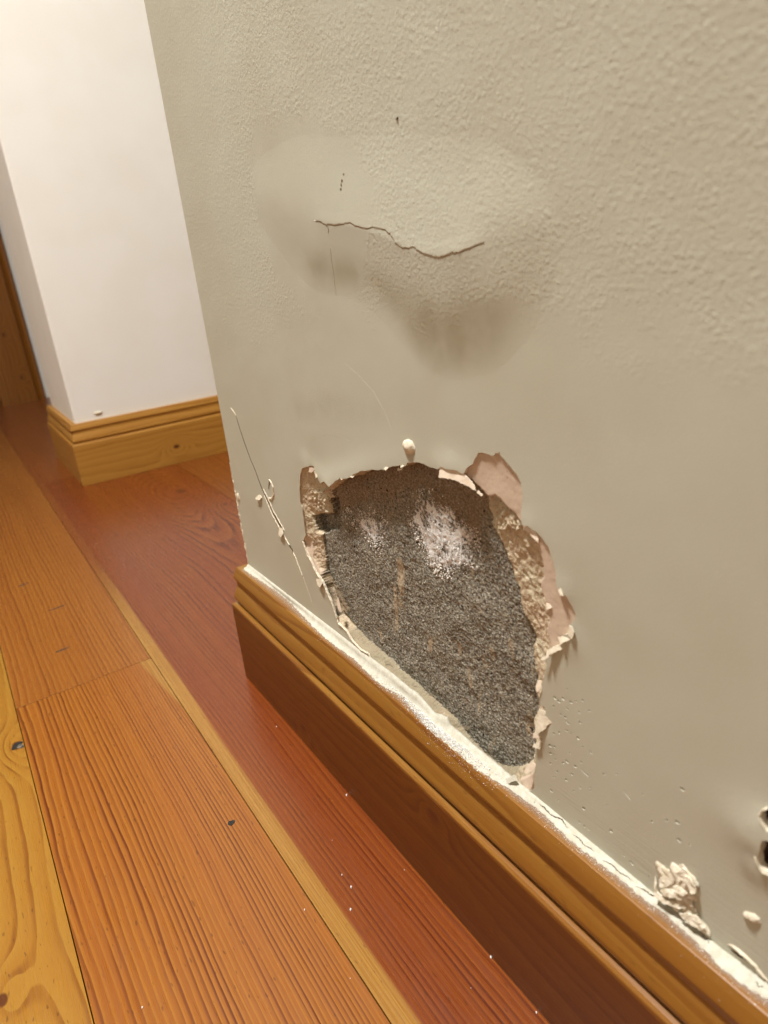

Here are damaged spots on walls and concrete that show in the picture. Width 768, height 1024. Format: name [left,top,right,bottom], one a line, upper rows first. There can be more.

crack [313,210,484,259]
spalling [301,453,575,790]
flaking render [648,861,711,937]